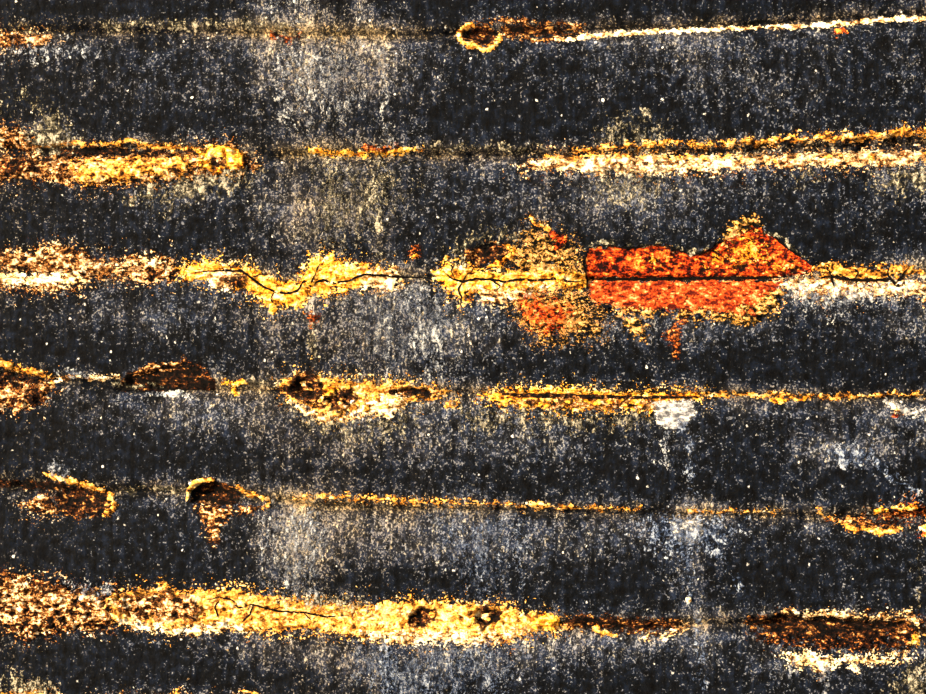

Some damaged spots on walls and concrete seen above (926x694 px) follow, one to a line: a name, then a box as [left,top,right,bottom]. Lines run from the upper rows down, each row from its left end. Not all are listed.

peeling [503,107,758,214]
crack [187,264,585,305]
rust [0,234,923,448]
peeling [766,634,847,665]